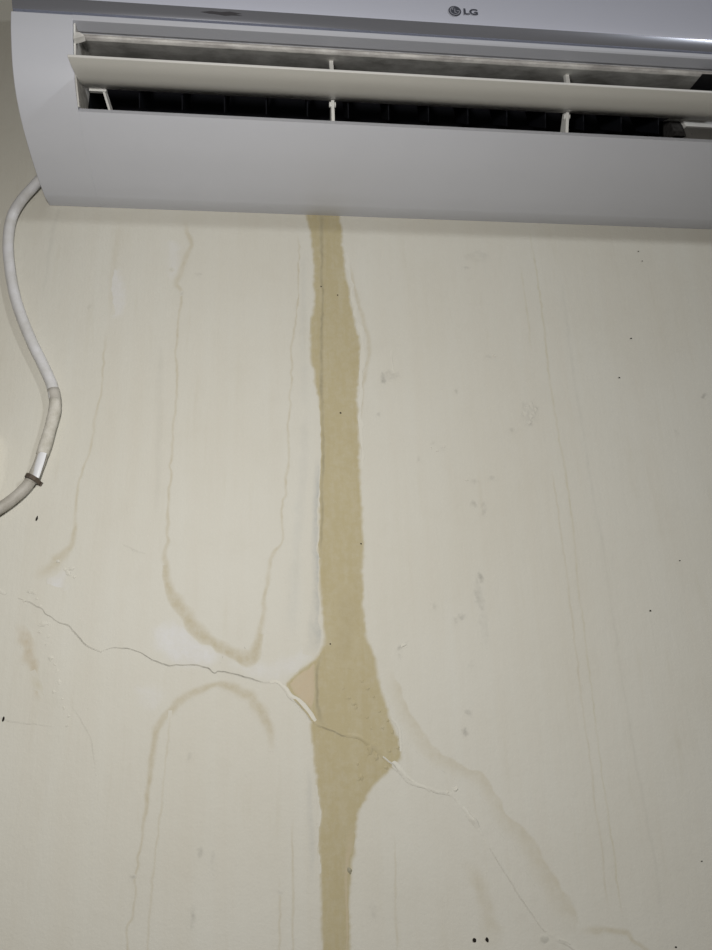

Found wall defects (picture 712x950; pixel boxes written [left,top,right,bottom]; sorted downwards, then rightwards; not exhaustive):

crack [19,597,579,950]
damp [124,215,666,950]